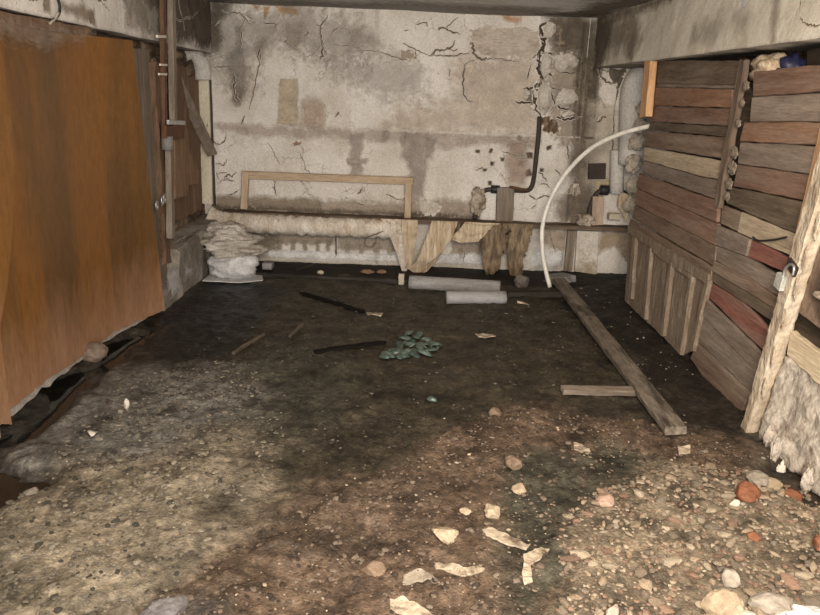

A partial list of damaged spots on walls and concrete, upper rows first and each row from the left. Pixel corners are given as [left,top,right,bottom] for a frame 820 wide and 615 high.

leakage [144,0,671,268]
crack [211,10,619,209]
crack [800,0,820,28]